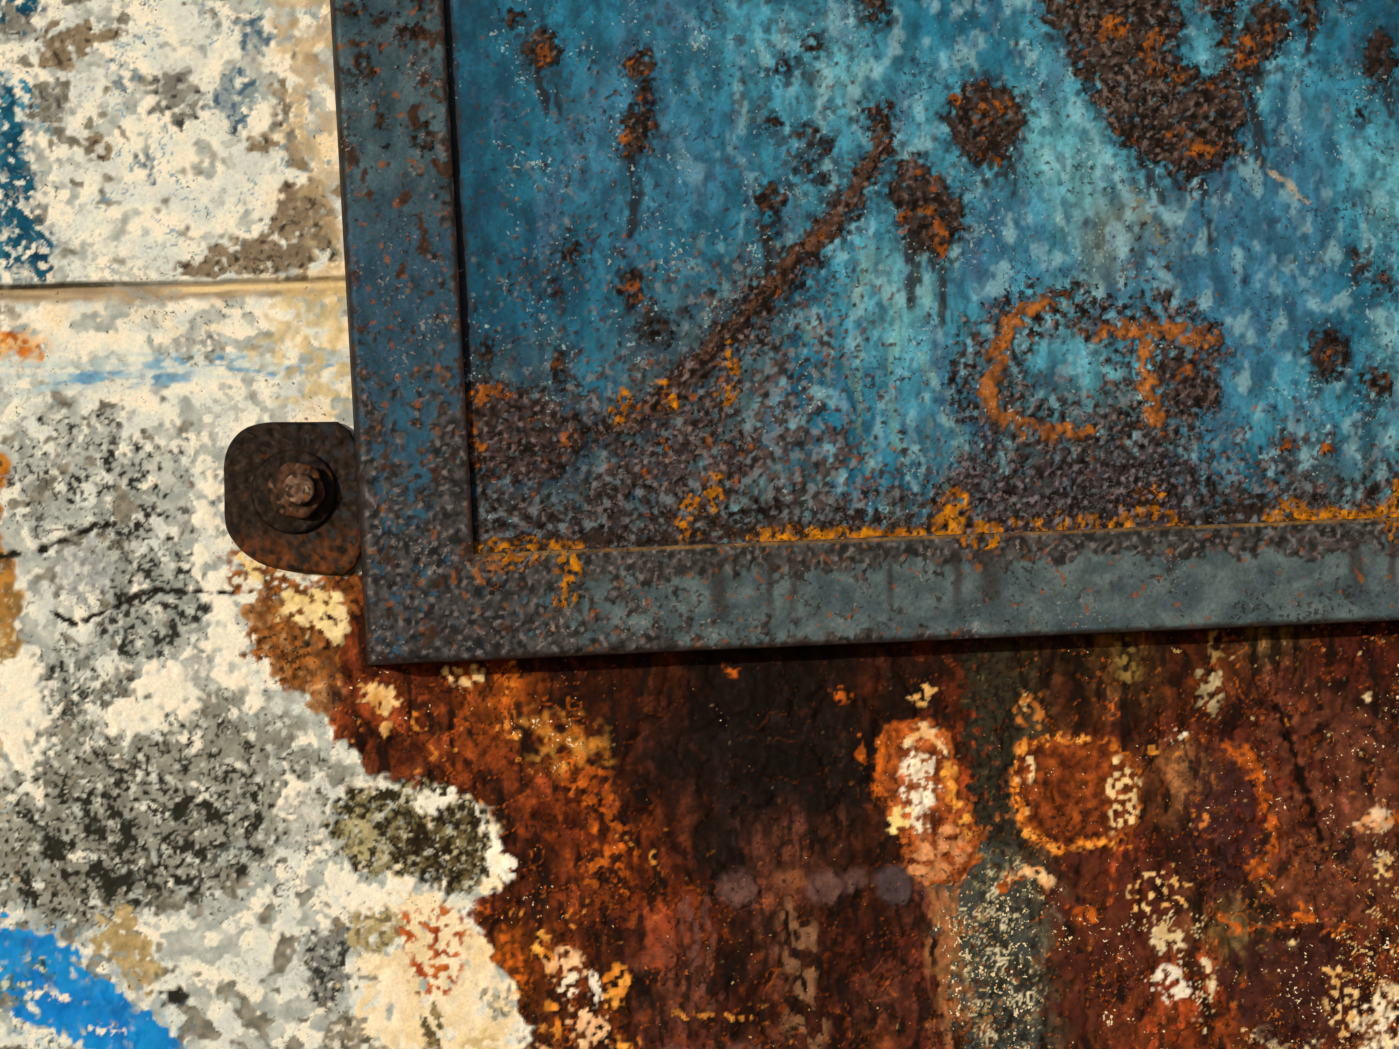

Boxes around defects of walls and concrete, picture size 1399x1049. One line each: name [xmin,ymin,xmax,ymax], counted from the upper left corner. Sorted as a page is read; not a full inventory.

rust [335,0,426,45]
rust [340,44,434,152]
rust [462,0,1399,553]
crack [0,518,113,561]
crack [49,577,234,629]
rust [212,528,1399,1049]